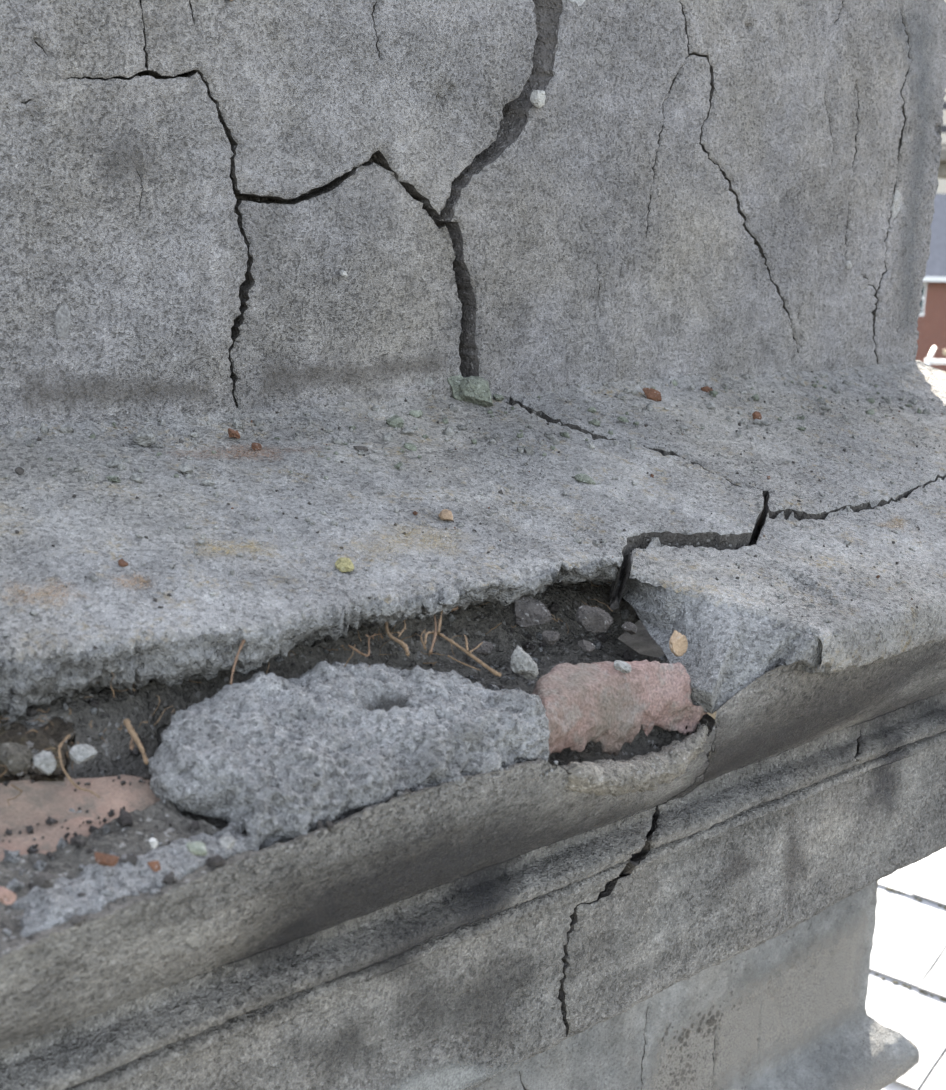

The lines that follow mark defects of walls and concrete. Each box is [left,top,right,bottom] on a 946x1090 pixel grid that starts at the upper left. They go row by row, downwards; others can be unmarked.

crack [67,0,563,407]
crack [646,2,800,353]
crack [825,89,859,171]
crack [863,184,896,364]
crack [897,11,912,158]
crack [509,397,946,611]
spalling [0,559,621,720]
crack [697,714,717,777]
spalling [147,860,161,872]
damp [243,811,638,977]
crack [557,805,660,1037]
crack [640,1008,648,1090]